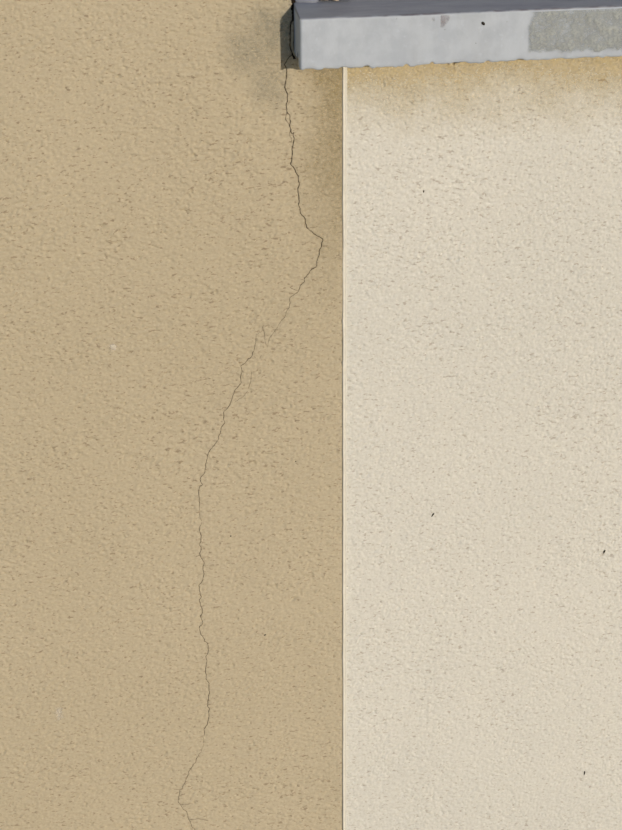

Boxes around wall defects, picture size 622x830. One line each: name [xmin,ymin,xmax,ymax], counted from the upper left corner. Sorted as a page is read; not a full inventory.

crack [176,0,323,828]